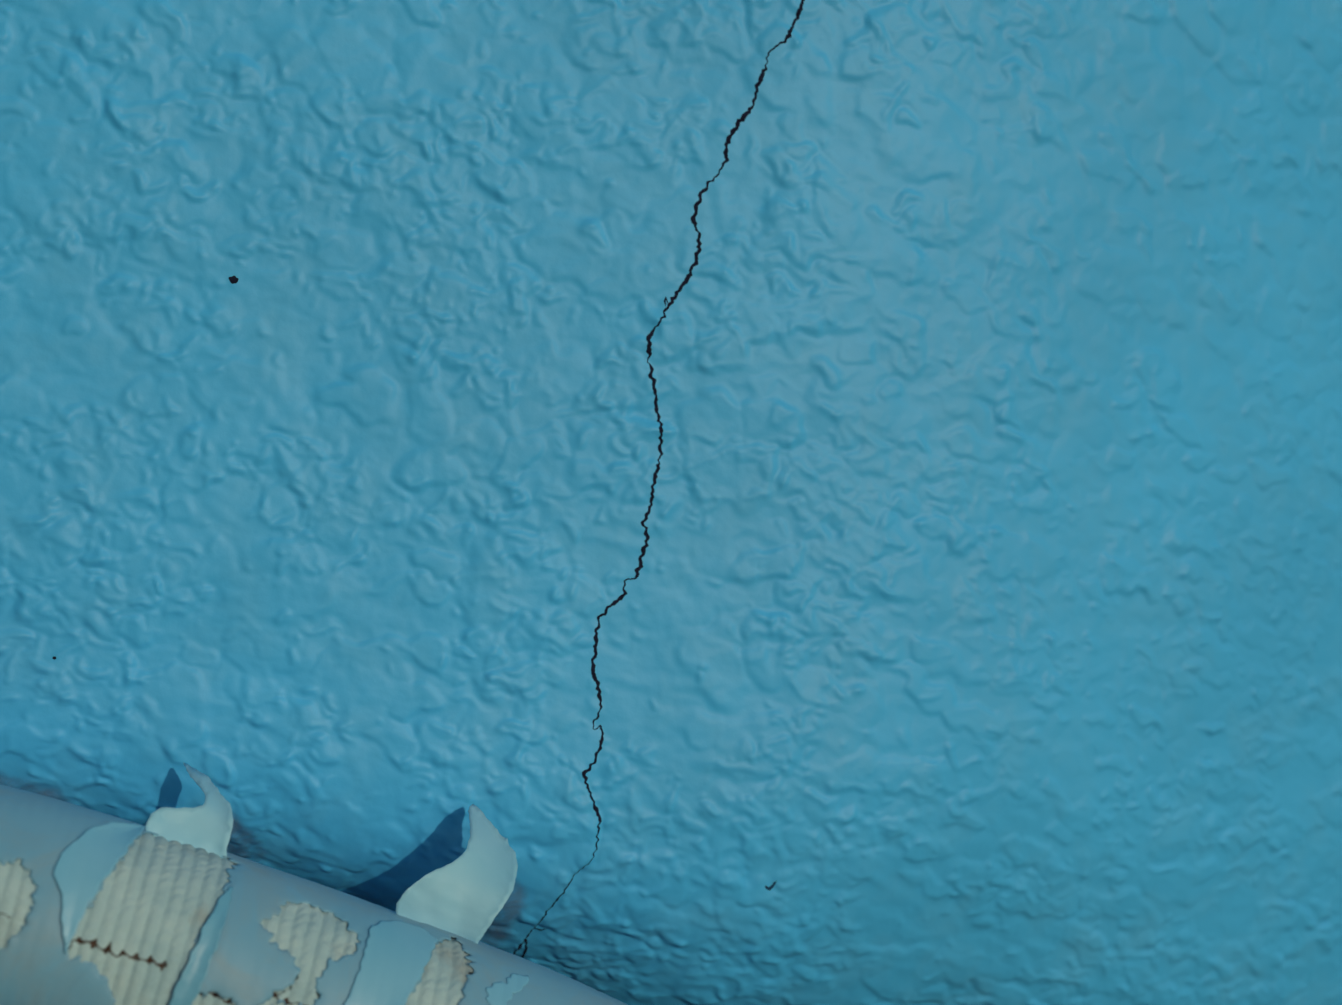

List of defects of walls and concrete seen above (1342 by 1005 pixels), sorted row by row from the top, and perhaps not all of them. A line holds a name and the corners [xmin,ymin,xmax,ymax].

crack [513,0,805,958]